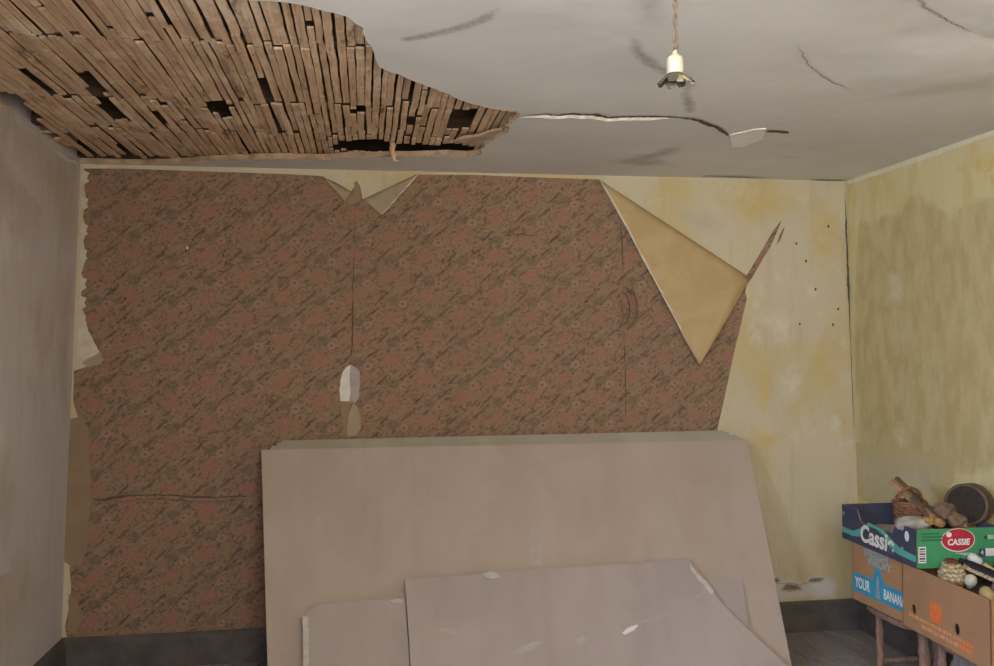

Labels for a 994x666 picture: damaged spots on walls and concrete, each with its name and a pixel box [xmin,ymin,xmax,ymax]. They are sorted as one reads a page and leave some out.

crack [917,0,989,38]
flaking render [0,0,521,164]
crack [516,113,728,136]
crack [766,128,789,136]
peeling [363,174,418,215]
peeling [599,179,750,364]